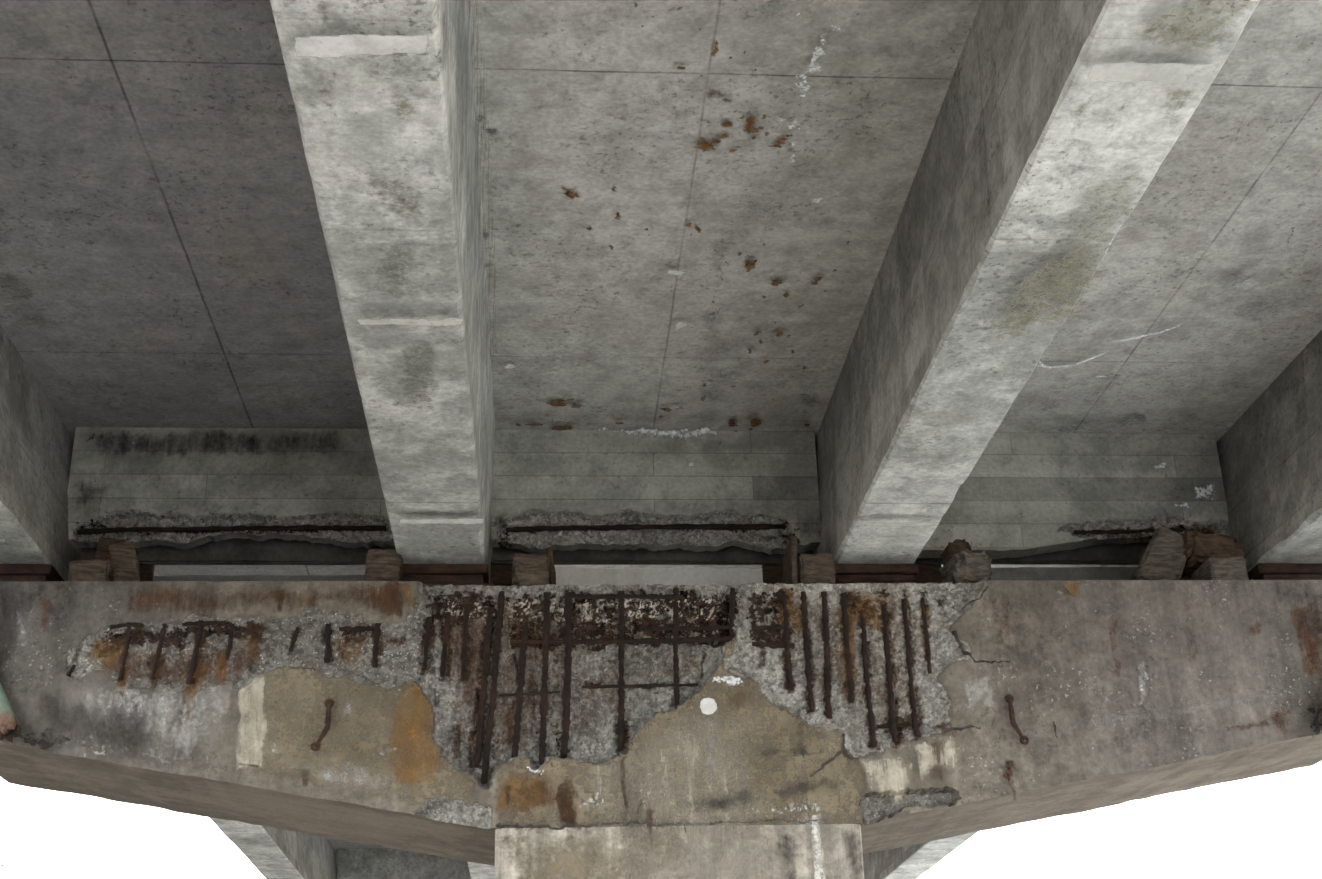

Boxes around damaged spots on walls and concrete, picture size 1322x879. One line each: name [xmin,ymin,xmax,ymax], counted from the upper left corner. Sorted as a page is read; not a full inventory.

efflorescence [795,25,841,97]
rust [695,92,793,153]
crack [1032,325,1180,386]
rust [516,399,582,431]
spalling [73,510,393,543]
spalling [491,510,800,549]
crack [952,586,1010,664]
spalling [66,581,983,789]
spalling [412,796,491,829]
spalling [859,788,957,825]